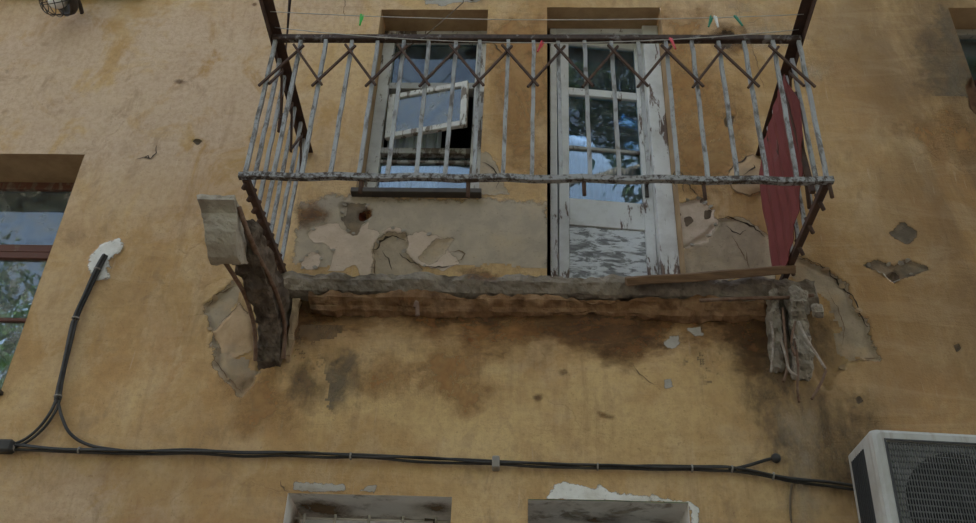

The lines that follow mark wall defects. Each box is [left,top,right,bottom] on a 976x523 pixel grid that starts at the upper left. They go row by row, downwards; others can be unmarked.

damp [663,8,750,189]
spalling [203,264,261,397]
rust [287,300,365,340]
damp [243,325,410,430]
peeling [293,152,547,275]
rust [404,312,676,362]
spalling [679,196,775,281]
rust [691,319,768,373]
damp [743,320,803,445]
spalling [770,256,882,383]
spalling [864,258,928,283]
damp [813,408,871,487]